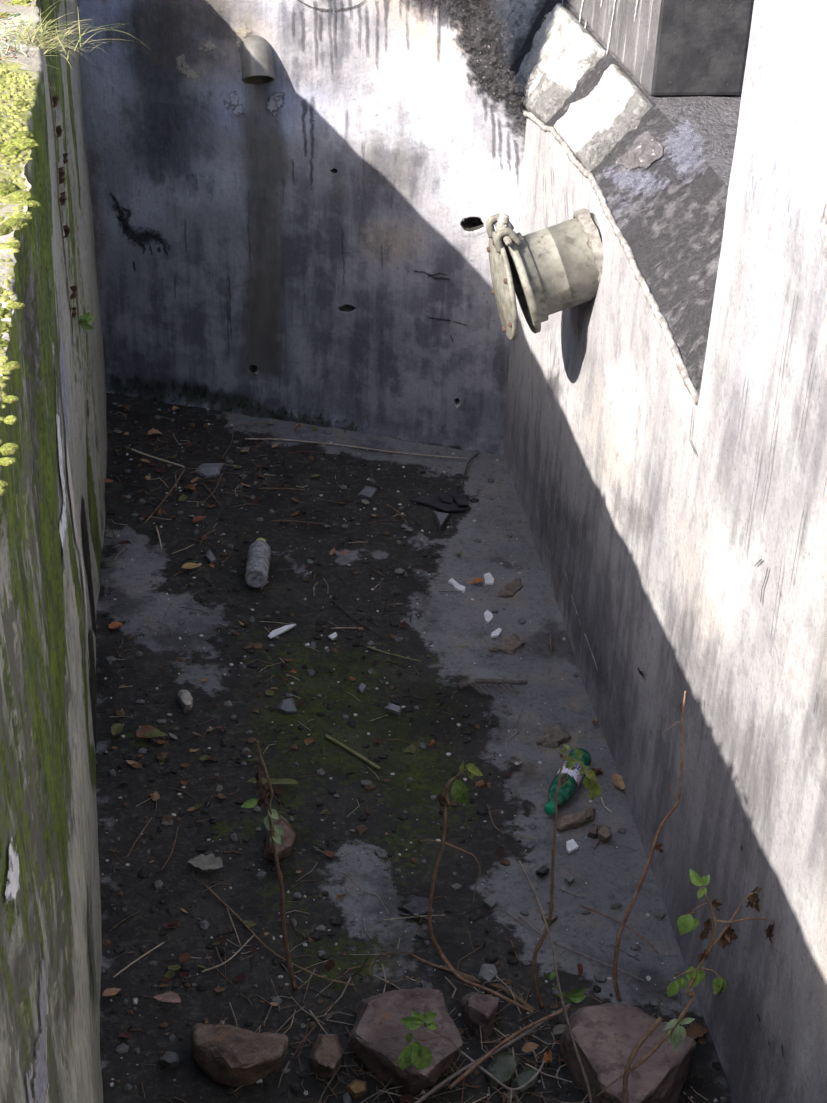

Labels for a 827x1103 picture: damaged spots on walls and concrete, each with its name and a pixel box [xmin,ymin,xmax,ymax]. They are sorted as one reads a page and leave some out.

water stain [292,0,461,72]
water stain [301,98,314,183]
water stain [241,84,287,372]